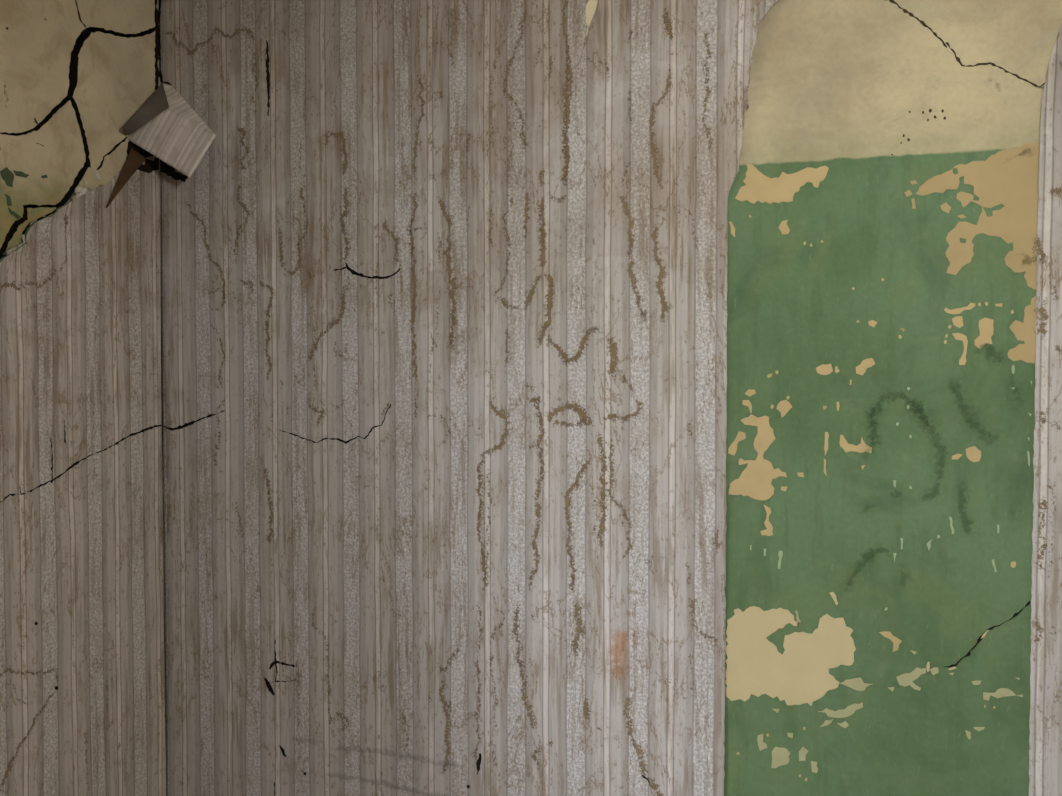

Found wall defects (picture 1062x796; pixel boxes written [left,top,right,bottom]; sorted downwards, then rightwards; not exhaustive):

flaking render [0,0,156,250]
crack [0,0,163,259]
crack [334,263,400,279]
leakage [383,193,458,378]
leakage [486,0,599,363]
crack [889,0,1045,88]
peeling [904,143,1040,365]
crack [0,411,224,502]
leakage [518,338,643,590]
leakage [564,434,633,656]
peeling [728,389,804,536]
peeling [725,592,872,728]